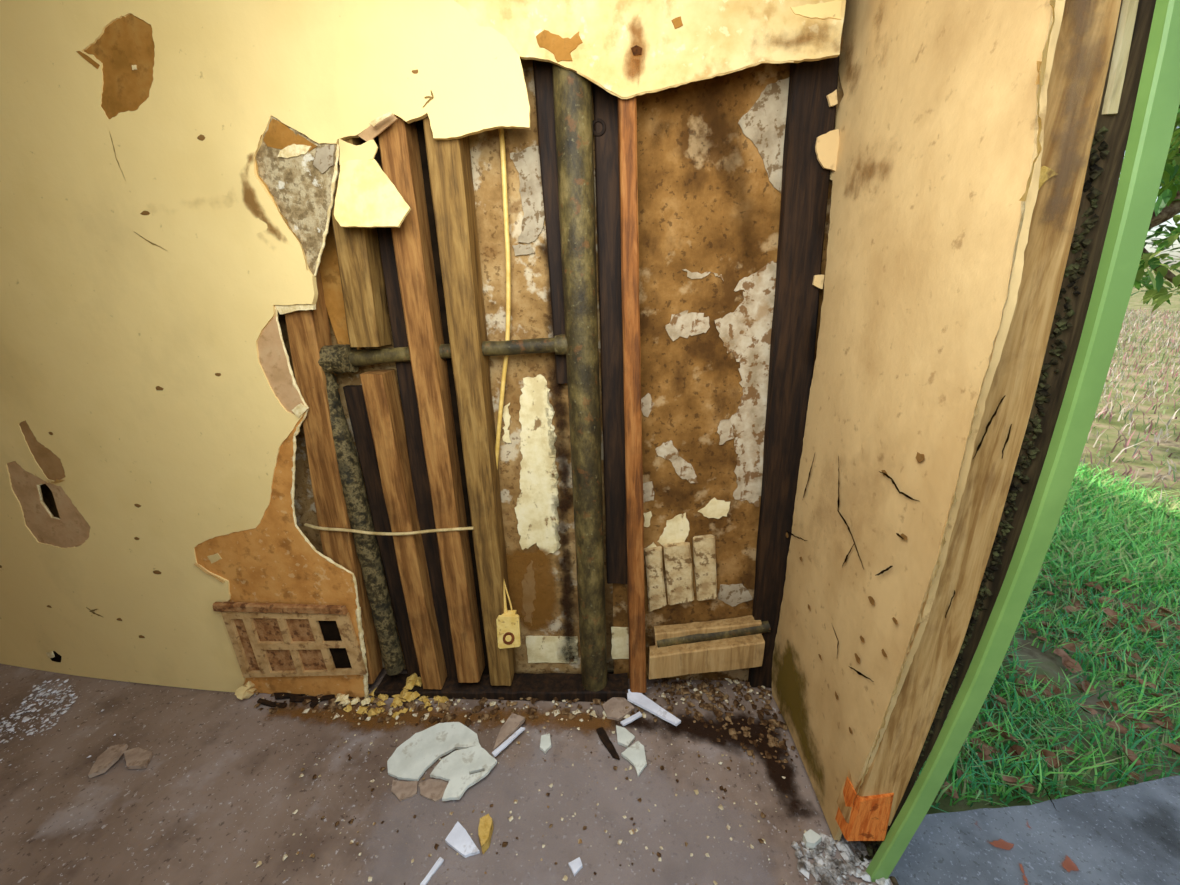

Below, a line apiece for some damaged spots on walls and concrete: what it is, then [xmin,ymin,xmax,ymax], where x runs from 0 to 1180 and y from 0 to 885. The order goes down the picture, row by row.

peeling [76,14,155,119]
spalling [364,282,394,349]
spalling [454,0,847,681]
peeling [7,420,90,548]
peeling [194,305,385,698]
spalling [337,362,403,521]
leakage [270,705,810,817]
leakage [772,644,823,789]